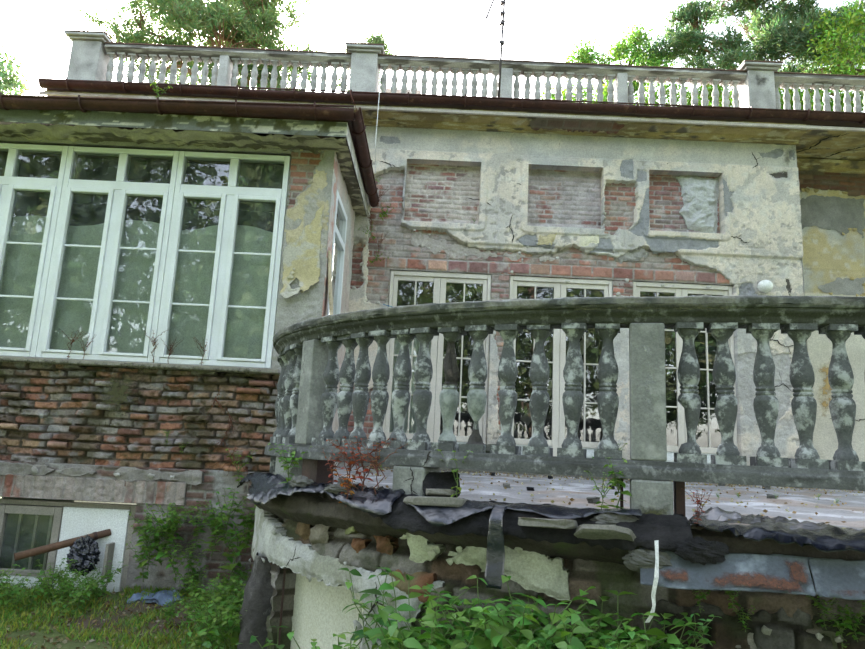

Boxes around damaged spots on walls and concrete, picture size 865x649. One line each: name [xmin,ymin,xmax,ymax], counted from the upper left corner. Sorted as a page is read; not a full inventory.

peeling [280,149,333,315]
flaking render [350,159,757,304]
peeling [769,171,865,238]
peeling [818,277,865,297]
flaking render [249,506,487,649]
flaking render [504,546,570,600]